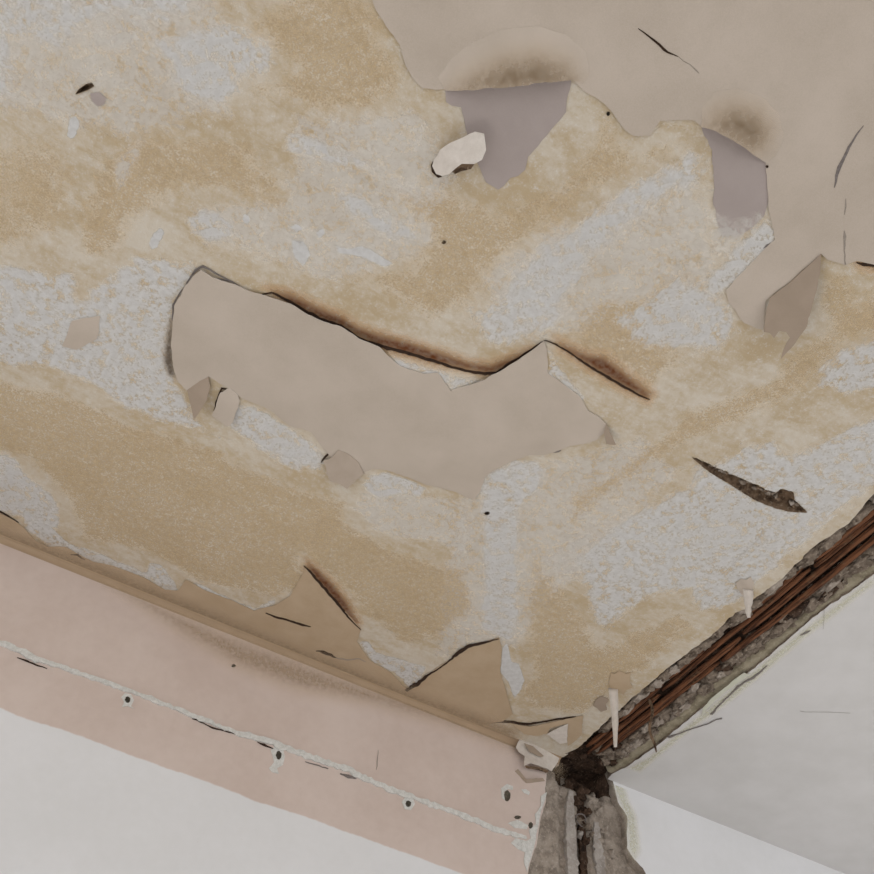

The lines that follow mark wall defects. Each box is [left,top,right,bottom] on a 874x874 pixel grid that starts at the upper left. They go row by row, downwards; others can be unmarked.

crack [638,28,699,73]
water stain [386,135,620,310]
peeling [372,0,874,358]
water stain [577,277,874,511]
water stain [0,385,466,639]
water stain [0,532,511,736]
crack [0,639,527,839]
peeling [0,257,637,874]
crack [495,716,576,725]
water stain [500,578,682,711]